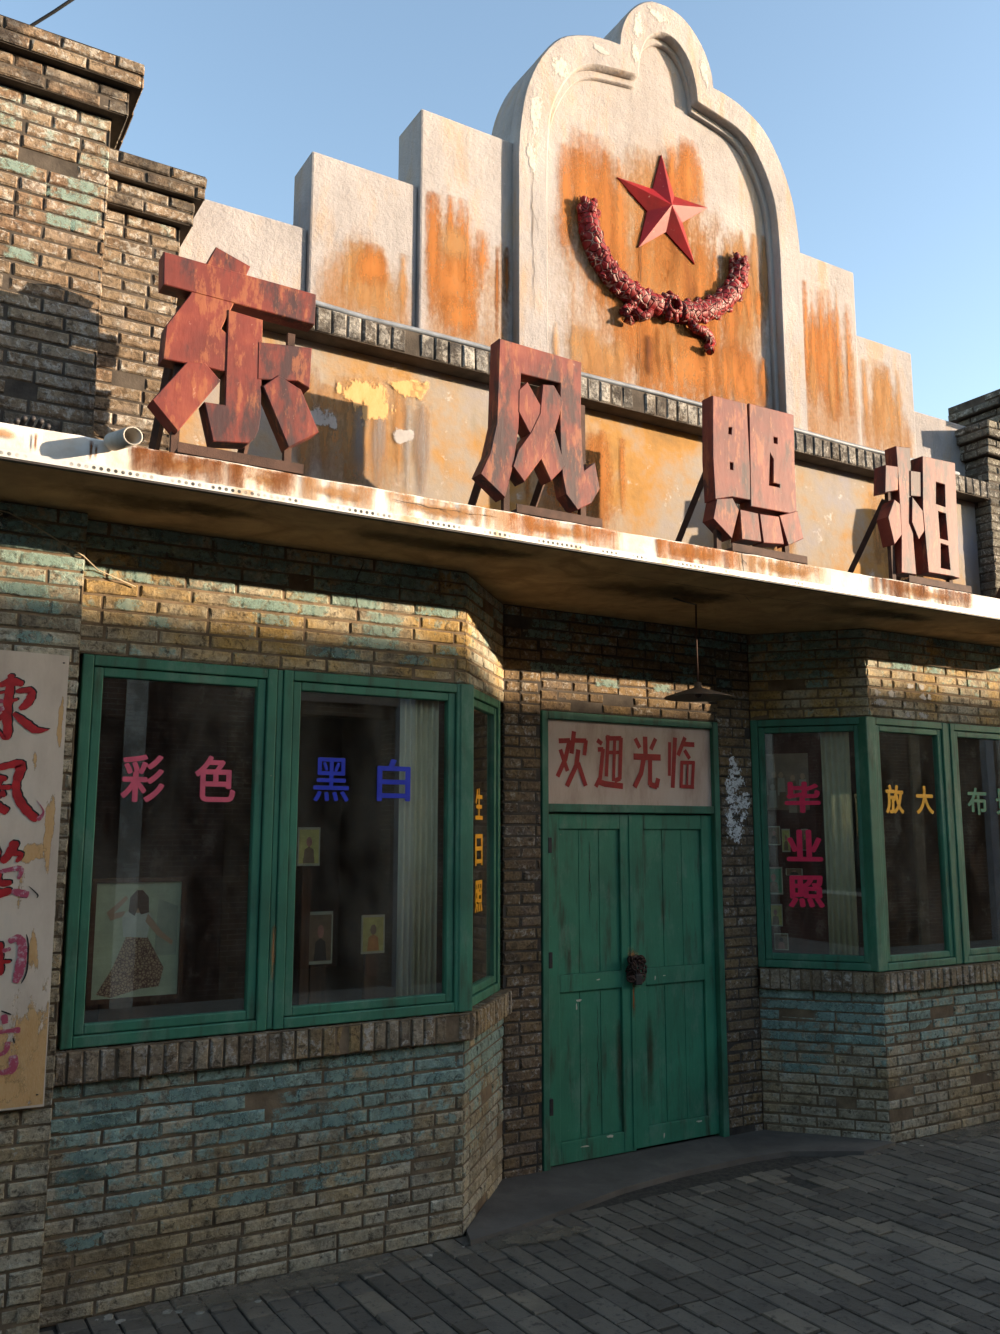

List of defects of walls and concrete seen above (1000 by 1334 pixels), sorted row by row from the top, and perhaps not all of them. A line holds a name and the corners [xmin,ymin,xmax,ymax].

rust [322,247,407,325]
rust [426,193,509,347]
rust [554,140,769,405]
rust [803,282,911,454]
rust [132,379,625,550]
leakage [373,535,516,556]